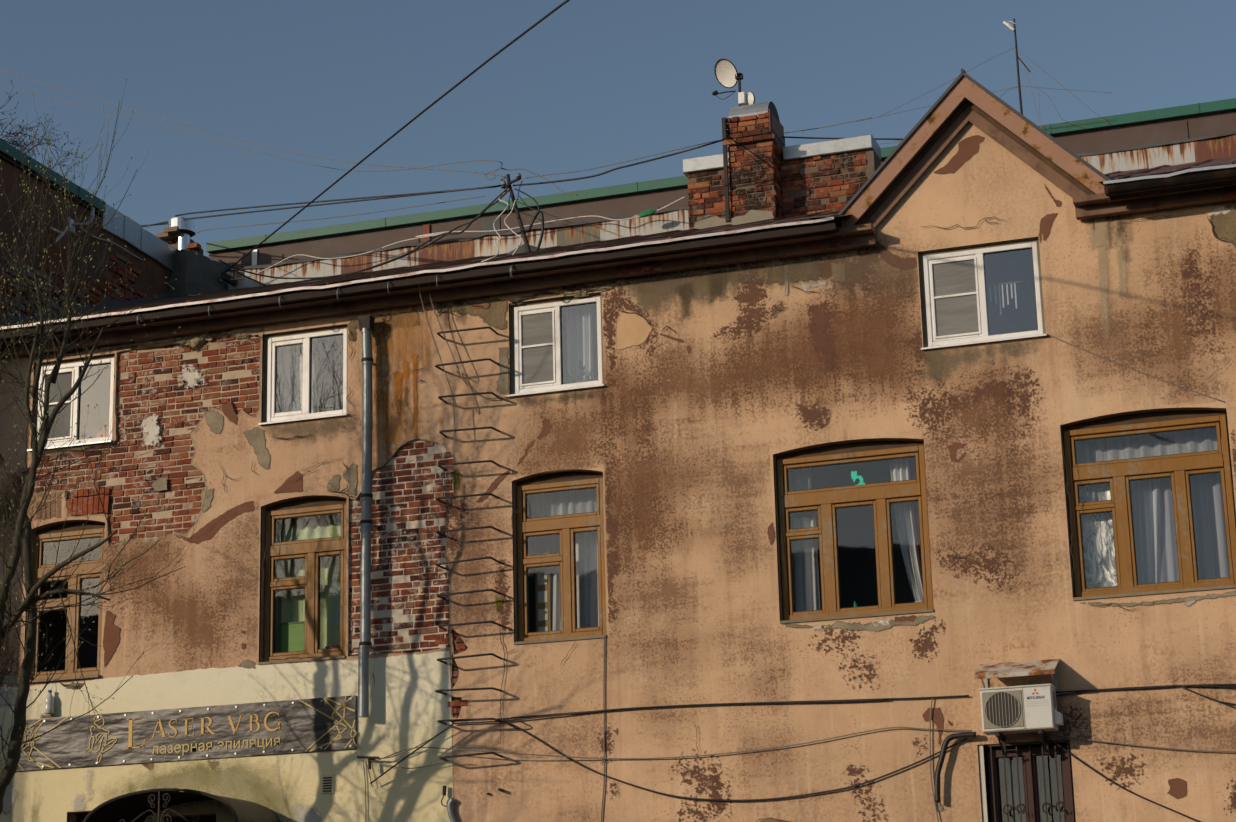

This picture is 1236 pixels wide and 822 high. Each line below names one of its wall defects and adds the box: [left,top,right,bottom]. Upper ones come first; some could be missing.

flaking render [0,253,157,330]
damp [626,255,819,316]
rust [372,305,429,460]
flaking render [0,332,262,669]
peeling [346,241,1044,719]